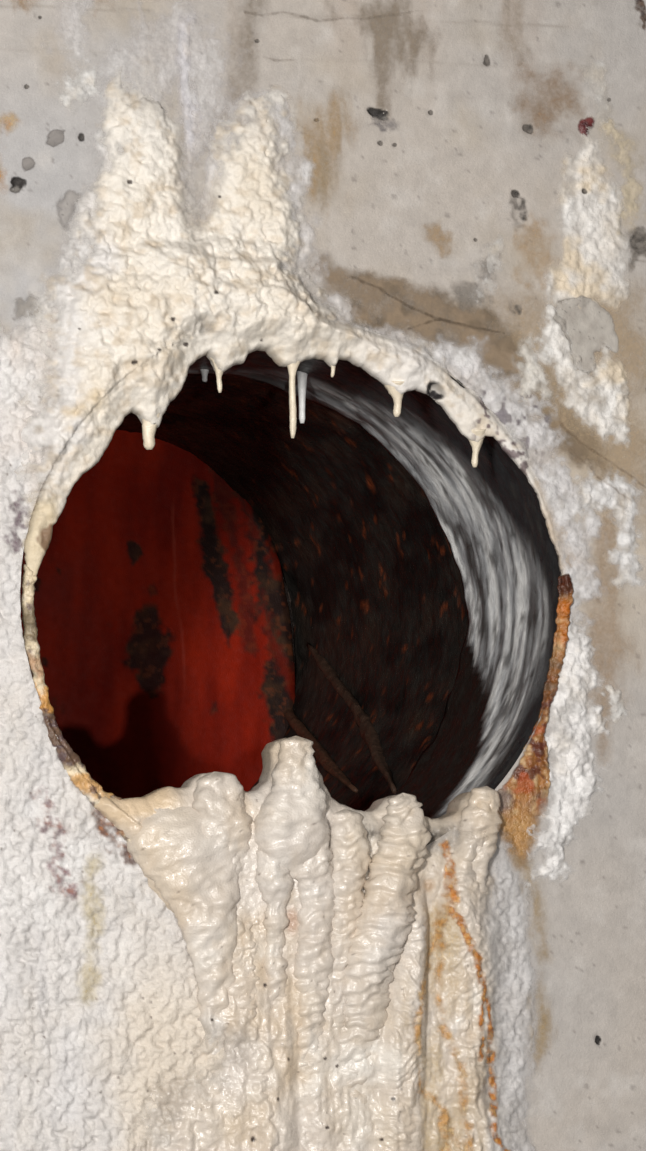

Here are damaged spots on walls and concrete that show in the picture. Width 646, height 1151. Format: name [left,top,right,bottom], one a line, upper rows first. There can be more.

water stain [0,308,225,1151]
water stain [21,0,562,576]
rust [415,841,509,1151]
water stain [312,120,646,880]
water stain [486,848,535,1151]
rust [497,574,574,865]